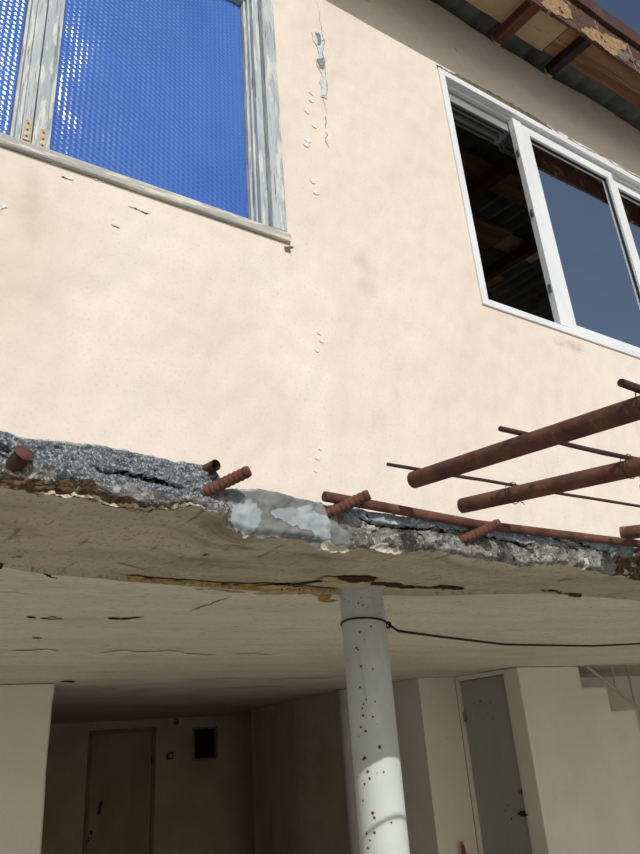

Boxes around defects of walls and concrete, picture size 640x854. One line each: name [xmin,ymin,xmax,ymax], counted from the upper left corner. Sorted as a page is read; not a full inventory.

spalling [0,471,215,513]